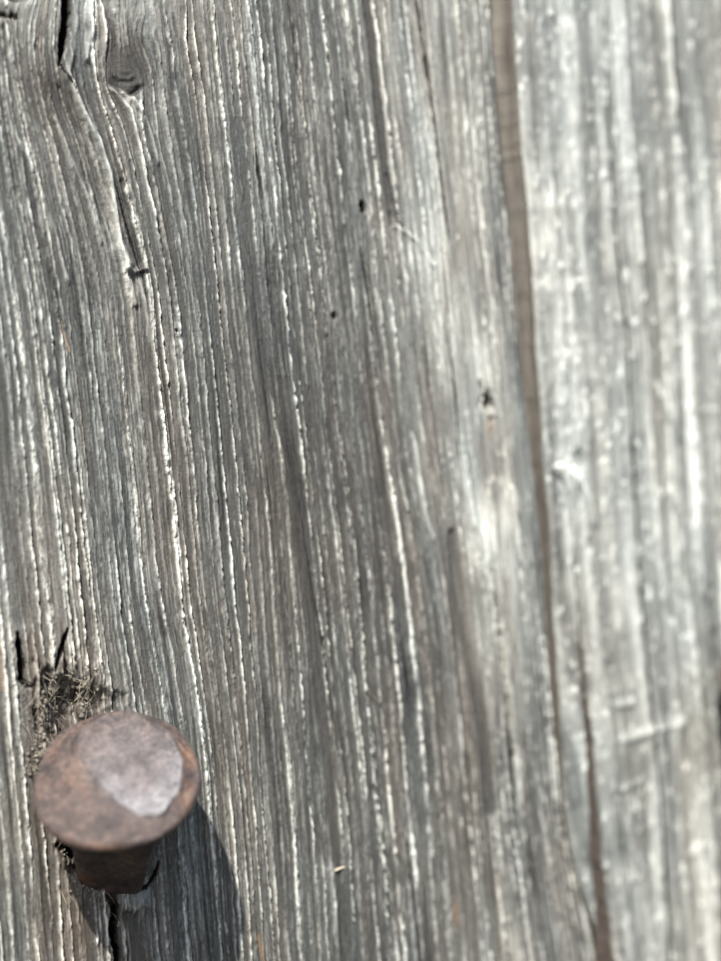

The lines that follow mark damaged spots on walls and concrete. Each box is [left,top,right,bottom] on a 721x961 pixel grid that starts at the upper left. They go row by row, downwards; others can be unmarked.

crack [57,0,77,89]
crack [116,187,141,274]
crack [142,861,159,890]
crack [108,901,119,961]